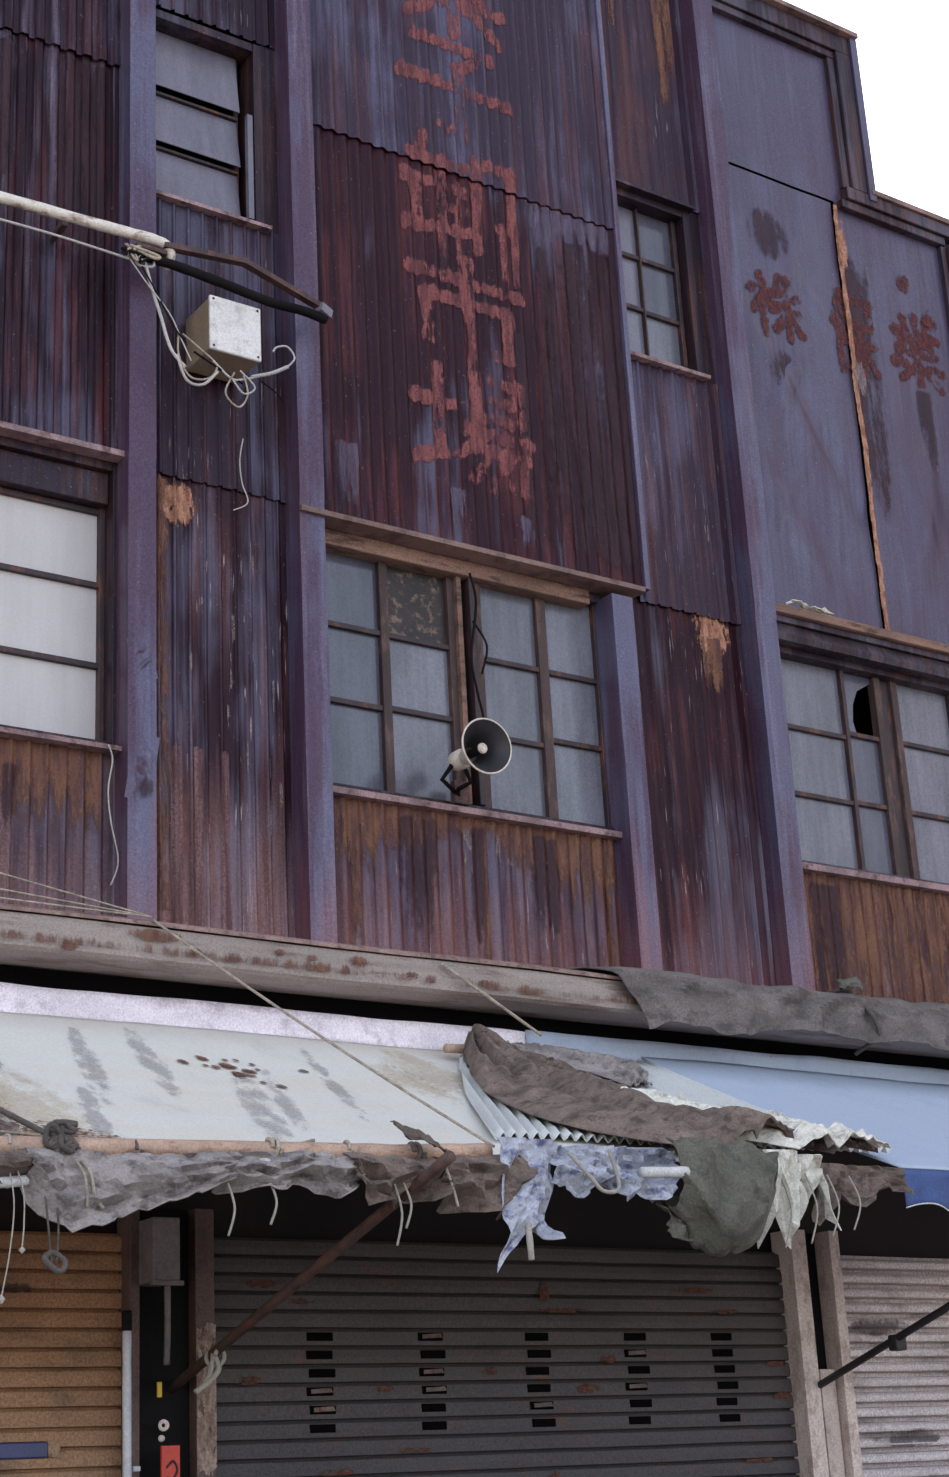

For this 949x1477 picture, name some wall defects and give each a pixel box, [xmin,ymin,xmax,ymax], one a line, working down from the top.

corrosion [0,37,14,173]
corrosion [54,56,107,278]
corrosion [692,613,731,692]
corrosion [129,476,436,983]
corrosion [0,737,100,903]
corrosion [1,930,109,951]
corrosion [333,796,616,967]
corrosion [479,980,542,994]
corrosion [803,871,949,1004]